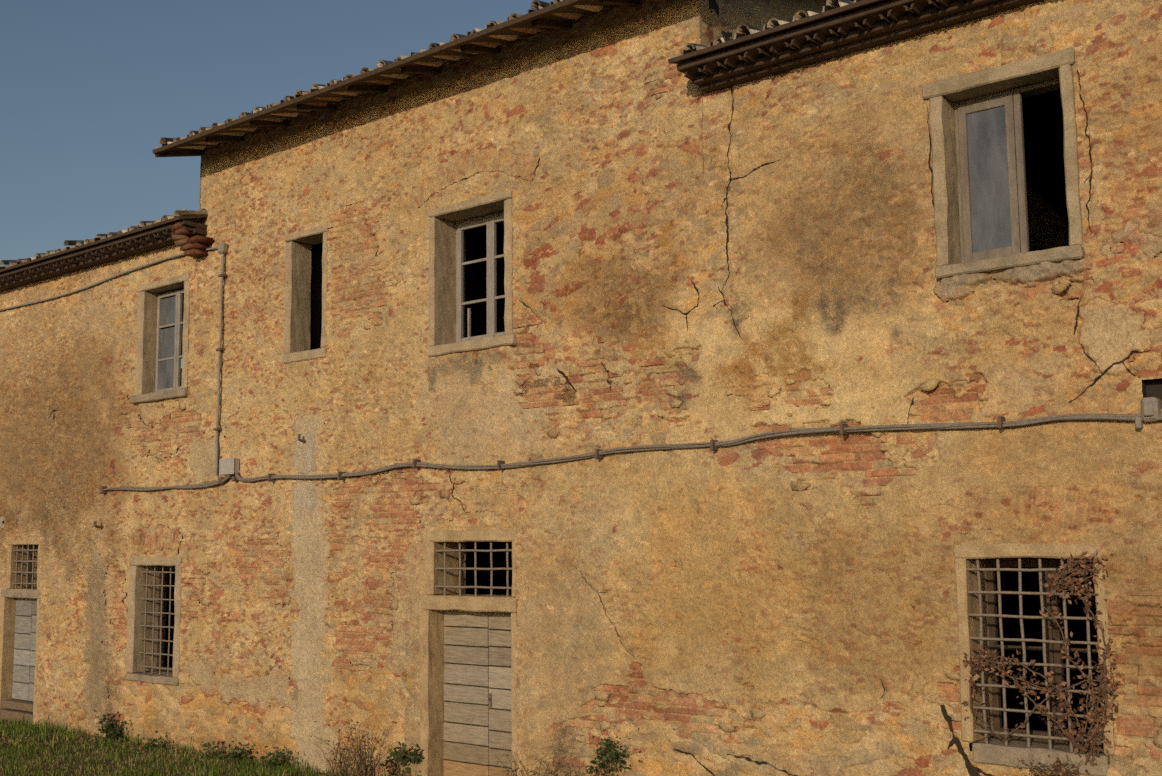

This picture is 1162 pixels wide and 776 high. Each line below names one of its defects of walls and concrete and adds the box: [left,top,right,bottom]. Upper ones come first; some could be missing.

crack [662,87,781,340]
spalling [507,315,702,438]
spalling [716,362,917,508]
spalling [907,374,988,424]
spalling [327,459,457,678]
crack [575,566,632,655]
spalling [564,663,766,749]
spalling [1108,588,1162,757]